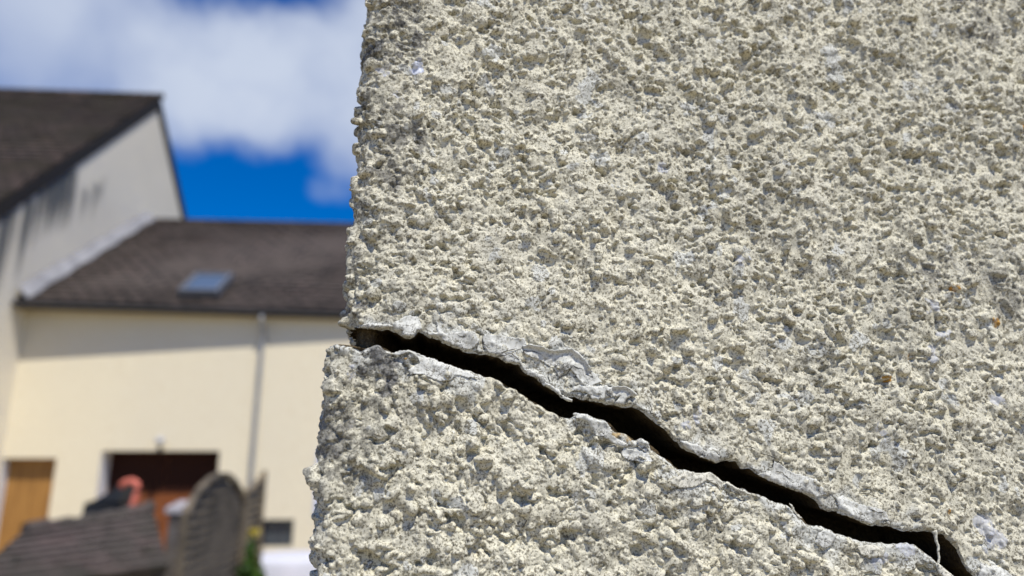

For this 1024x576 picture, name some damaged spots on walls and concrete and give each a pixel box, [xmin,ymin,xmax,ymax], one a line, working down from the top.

crack [338,328,972,576]